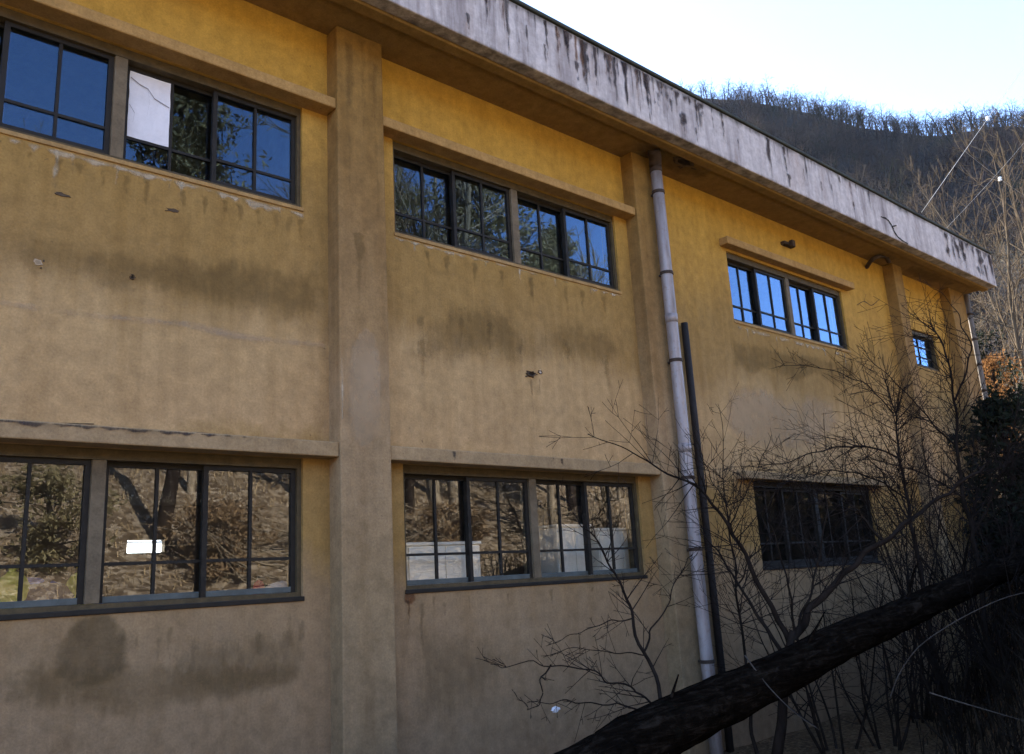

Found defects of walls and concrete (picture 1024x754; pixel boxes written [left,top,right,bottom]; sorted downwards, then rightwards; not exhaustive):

water stain [502,0,724,140]
water stain [766,138,791,183]
water stain [944,232,995,282]